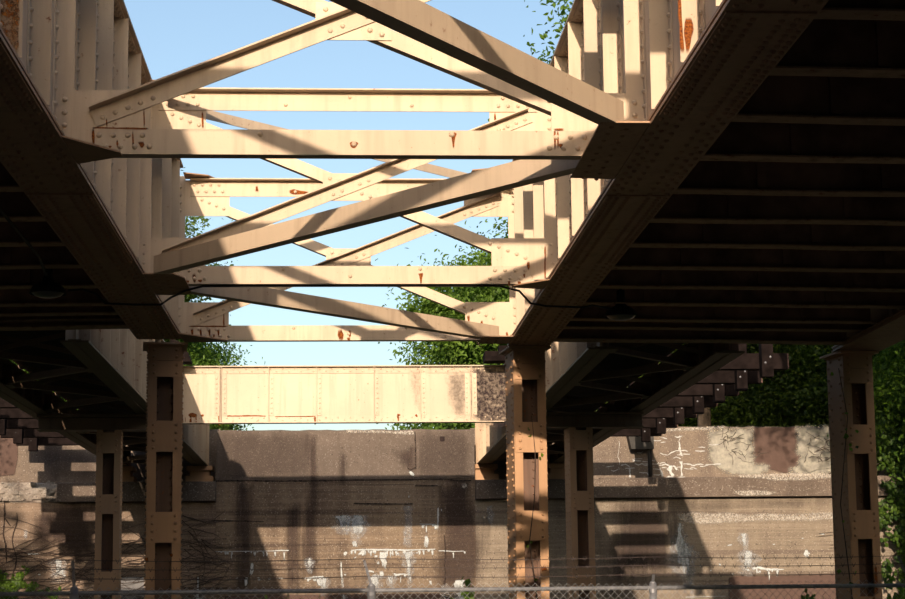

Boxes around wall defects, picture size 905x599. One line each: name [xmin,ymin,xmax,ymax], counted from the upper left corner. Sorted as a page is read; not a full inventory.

rust [0,0,20,50]
rust [678,0,693,51]
spalling [0,481,57,501]
damp [215,447,326,587]
damp [336,485,476,599]
damp [742,534,784,579]